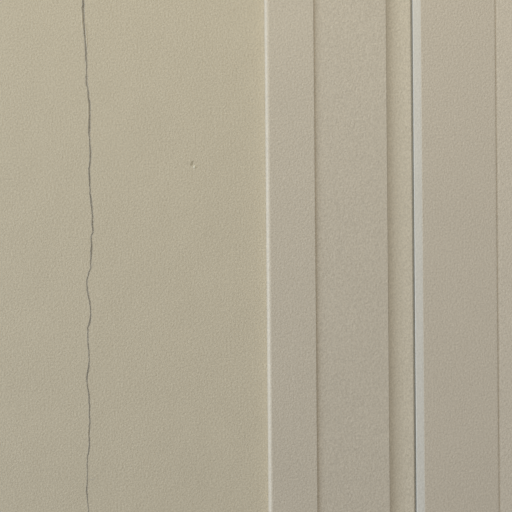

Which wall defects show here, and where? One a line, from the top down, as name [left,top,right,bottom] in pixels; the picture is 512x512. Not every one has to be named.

crack [81,0,96,512]